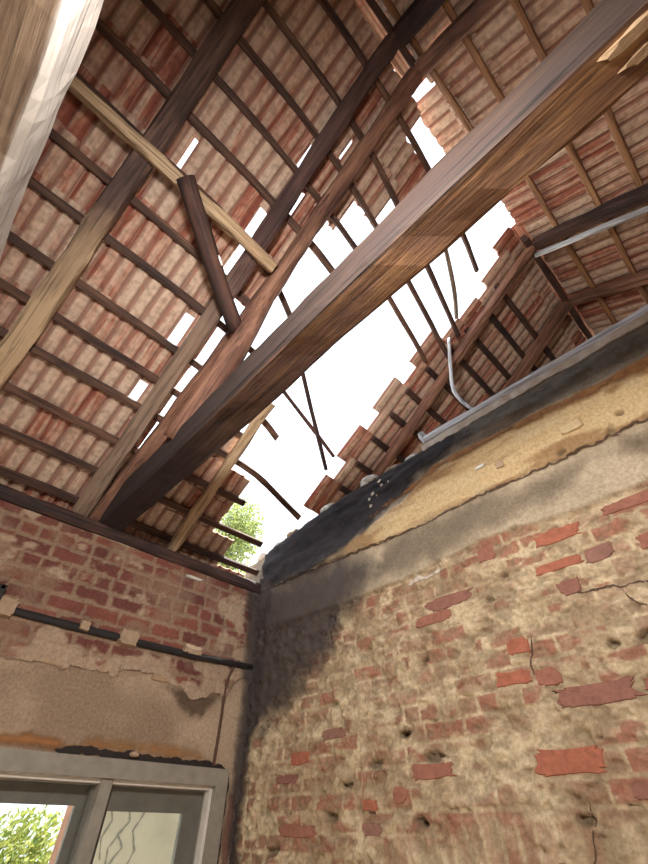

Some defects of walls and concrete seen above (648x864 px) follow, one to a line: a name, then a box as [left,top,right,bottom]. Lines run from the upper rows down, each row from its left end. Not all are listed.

crack [272,418,648,588]
flaking render [601,489,648,516]
flaking render [533,521,583,548]
flaking render [535,541,615,577]
flaking render [0,500,250,700]
flaking render [416,587,473,628]
flaking render [555,577,583,596]
crack [567,580,648,606]
water stain [173,690,215,716]
flaking render [496,666,648,709]
flaking render [411,761,457,781]
flaking render [534,745,608,777]